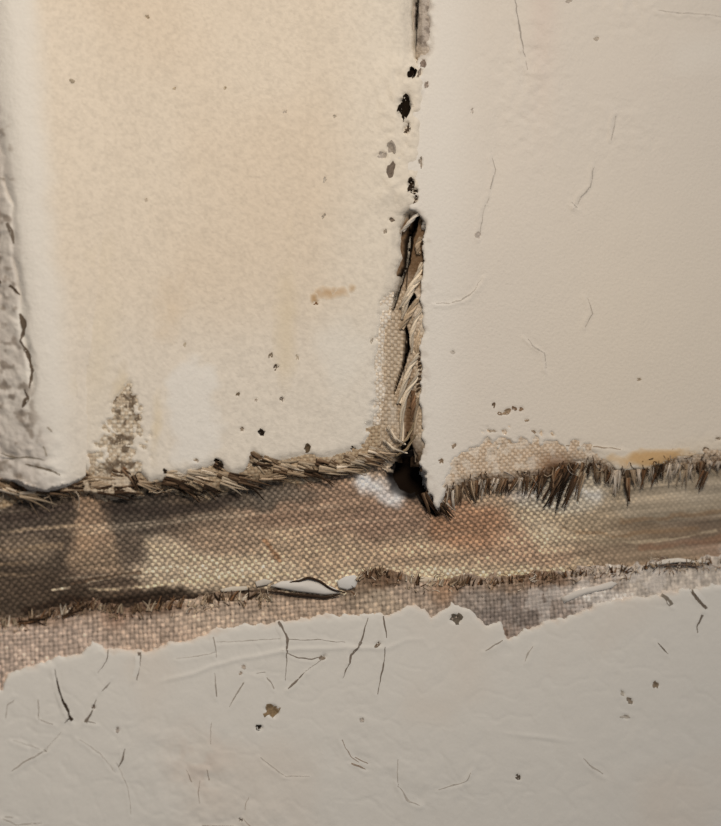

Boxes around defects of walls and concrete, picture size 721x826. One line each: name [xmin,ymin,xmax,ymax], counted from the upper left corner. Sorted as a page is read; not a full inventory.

spalling [95,383,147,476]
peeling [654,558,710,568]
peeling [220,575,358,599]
peeling [256,704,281,730]